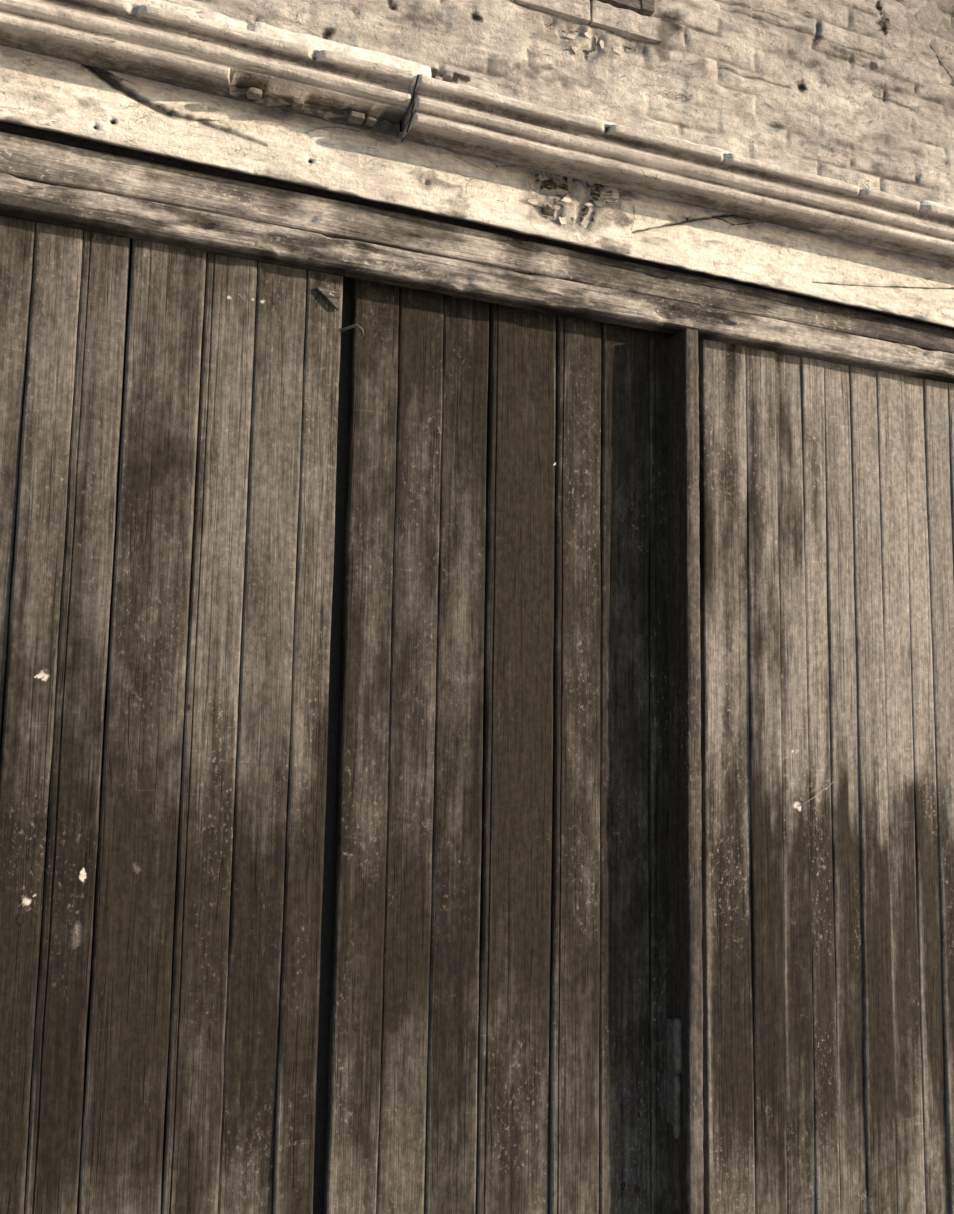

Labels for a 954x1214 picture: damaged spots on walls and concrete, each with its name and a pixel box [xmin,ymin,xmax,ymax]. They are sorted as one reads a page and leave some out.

crack [81,64,261,144]
crack [406,74,419,133]
flaking render [526,170,621,231]
crack [632,210,758,233]
crack [812,281,954,289]